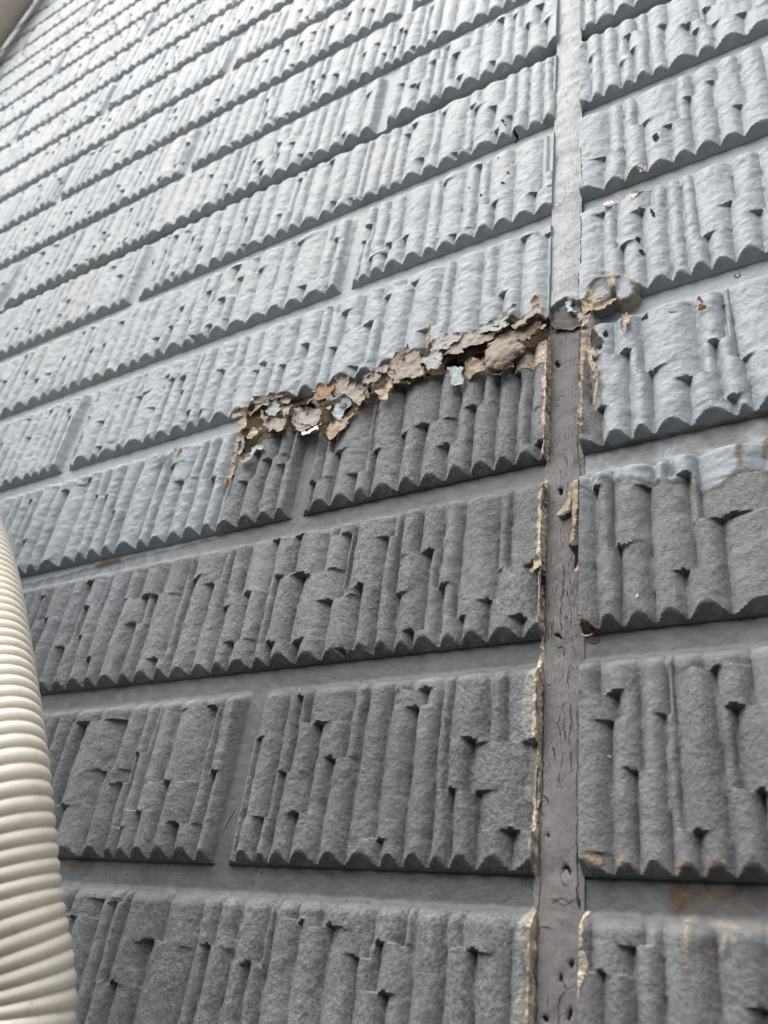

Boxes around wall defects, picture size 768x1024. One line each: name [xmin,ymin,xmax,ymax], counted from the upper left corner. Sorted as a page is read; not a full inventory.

peeling [565,295,608,429]
peeling [223,303,580,878]
spalling [577,612,600,644]
crack [535,541,579,1024]
spalling [582,849,603,870]
spalling [524,908,537,1024]
spalling [577,898,590,1000]